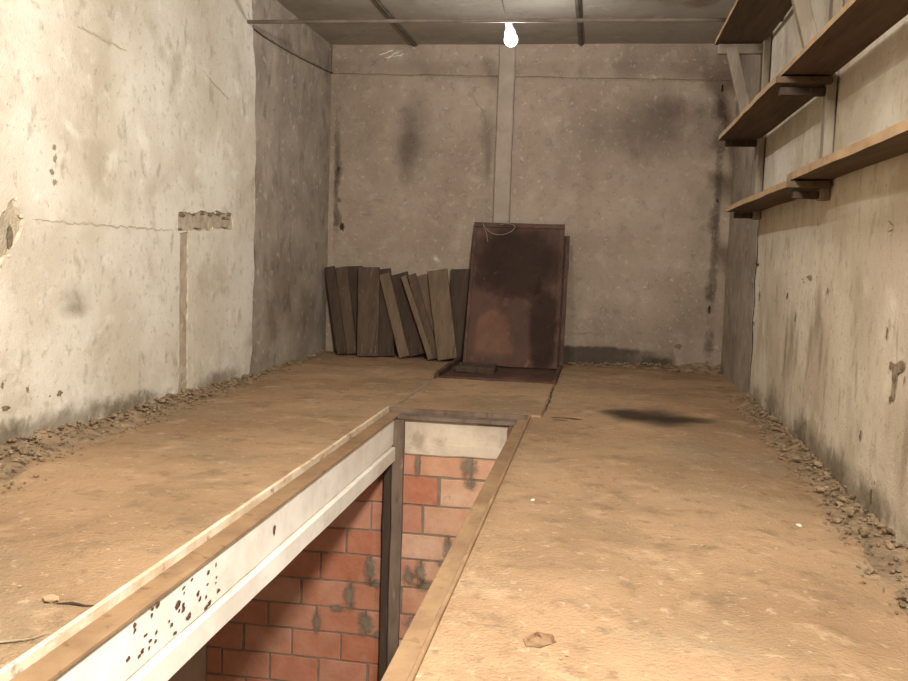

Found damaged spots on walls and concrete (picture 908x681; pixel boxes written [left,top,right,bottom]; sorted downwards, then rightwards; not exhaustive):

spalling [0,196,24,284]
spalling [177,210,233,393]
spalling [889,360,905,402]